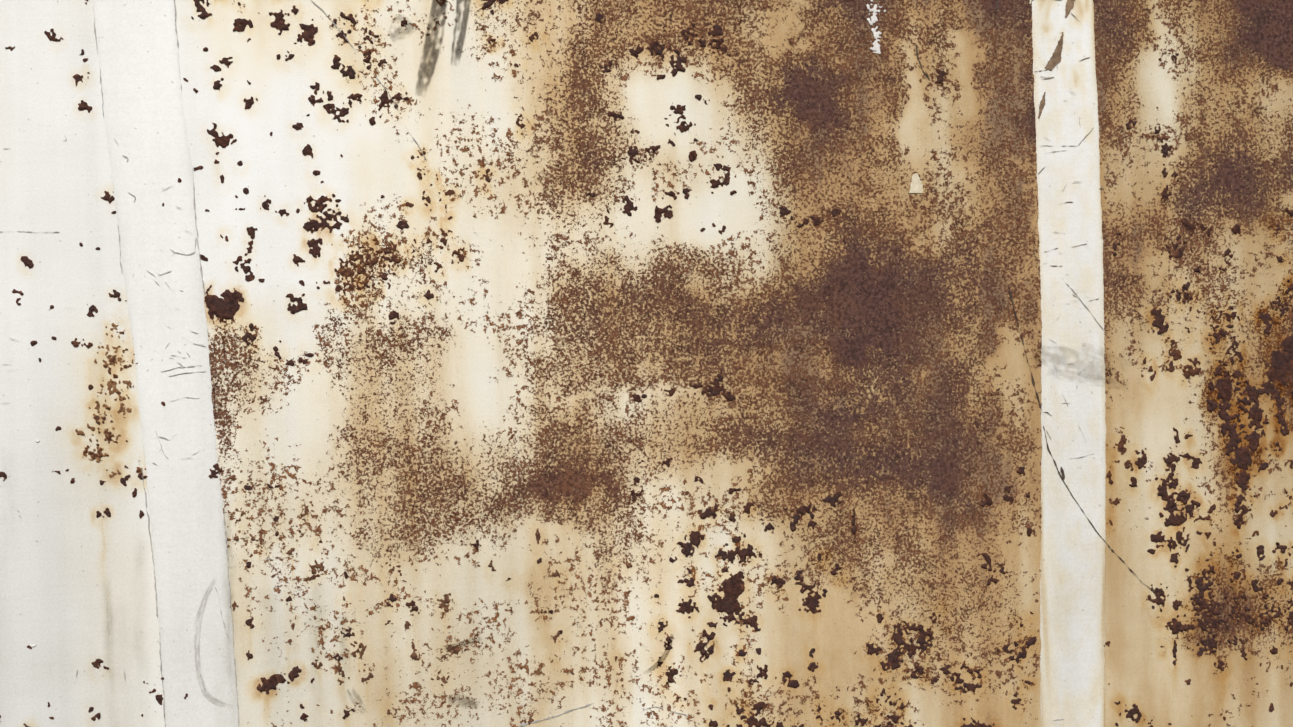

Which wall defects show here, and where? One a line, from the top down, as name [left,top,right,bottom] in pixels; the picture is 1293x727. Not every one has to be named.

rust [191,0,212,21]
rust [183,47,233,93]
rust [178,123,237,183]
rust [204,0,1042,727]
rust [30,304,148,518]